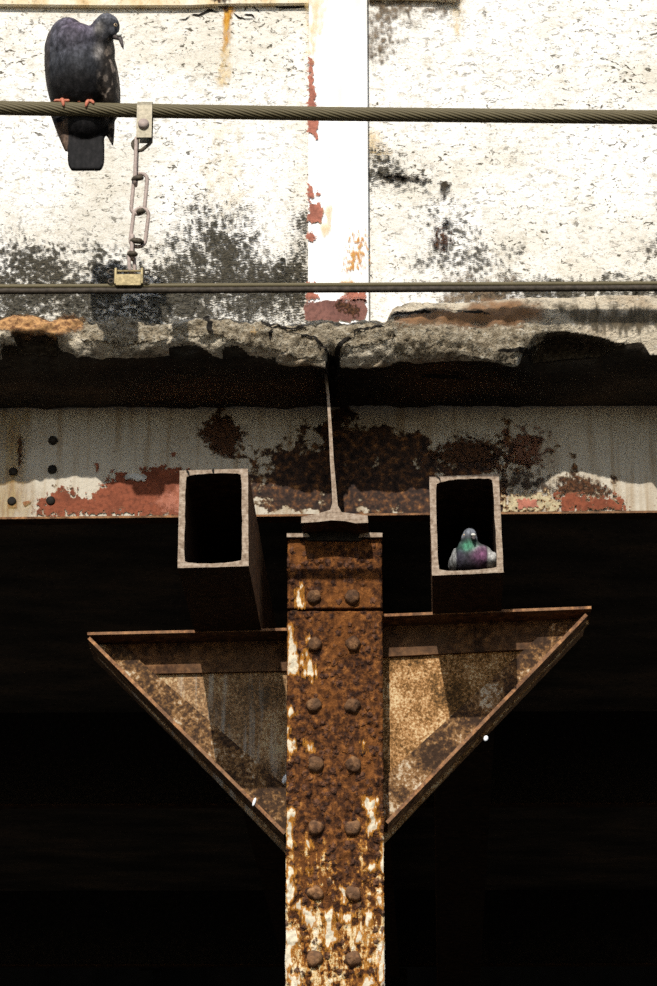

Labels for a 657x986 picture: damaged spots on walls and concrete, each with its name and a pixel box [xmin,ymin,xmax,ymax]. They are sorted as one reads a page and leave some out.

damp [0,194,308,325]
corrosion [338,228,371,283]
spalling [0,332,76,358]
corrosion [0,313,86,339]
spalling [78,281,627,382]
corrosion [398,300,543,327]
peeling [10,452,190,517]
corrosion [196,415,246,458]
corrosion [429,424,614,501]